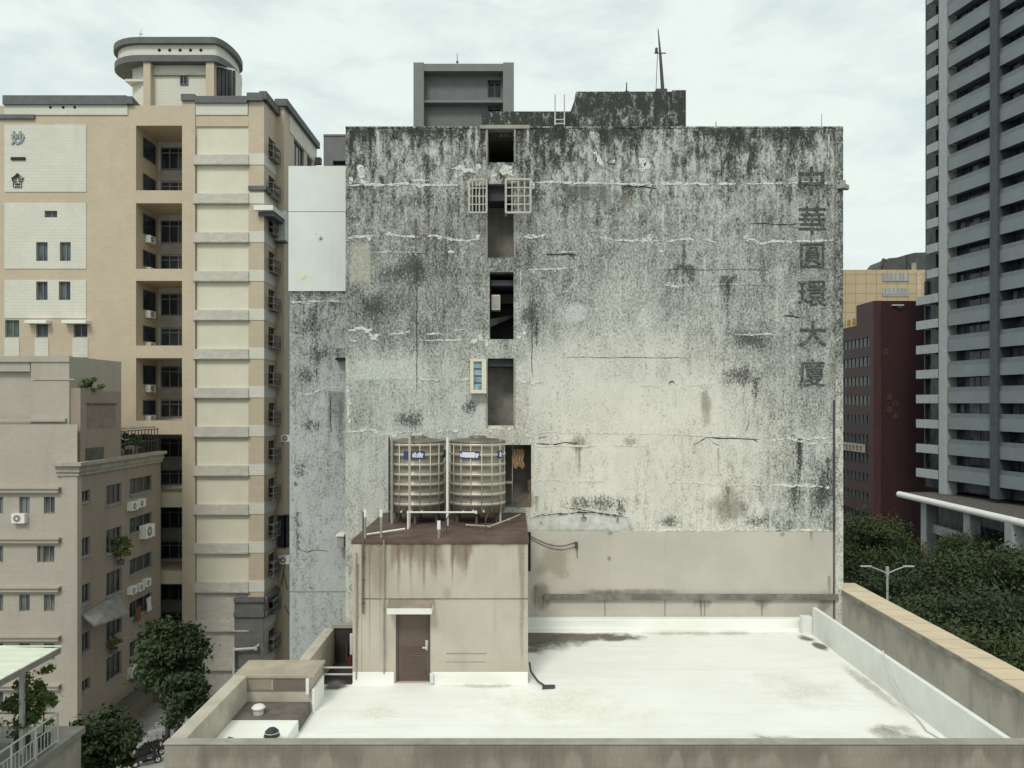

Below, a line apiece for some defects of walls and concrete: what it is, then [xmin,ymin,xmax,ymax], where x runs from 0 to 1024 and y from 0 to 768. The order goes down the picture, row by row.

damp [349,128,485,169]
peeling [346,163,481,188]
damp [518,129,640,204]
peeling [532,158,828,189]
peeling [346,231,481,253]
peeling [741,235,833,245]
peeling [348,326,489,346]
crack [697,421,759,446]
damp [566,496,628,517]
damp [528,633,637,652]